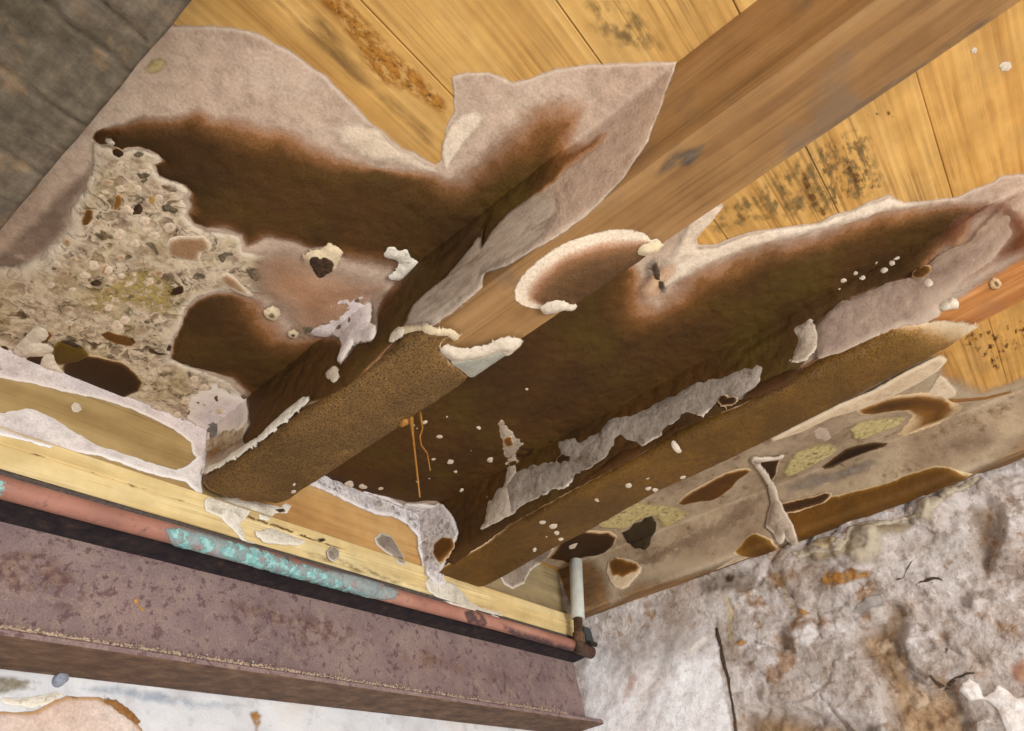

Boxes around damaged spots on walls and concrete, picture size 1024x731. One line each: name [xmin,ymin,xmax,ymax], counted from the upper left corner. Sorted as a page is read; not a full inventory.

leakage [314,0,443,109]
spalling [112,147,144,166]
leakage [735,139,879,224]
spalling [82,209,93,225]
spalling [133,196,178,215]
leakage [407,193,555,325]
spalling [165,286,184,296]
spalling [101,331,135,346]
leakage [966,328,1024,368]
peeling [928,375,957,399]
leakage [622,516,656,550]
rust [0,554,69,597]